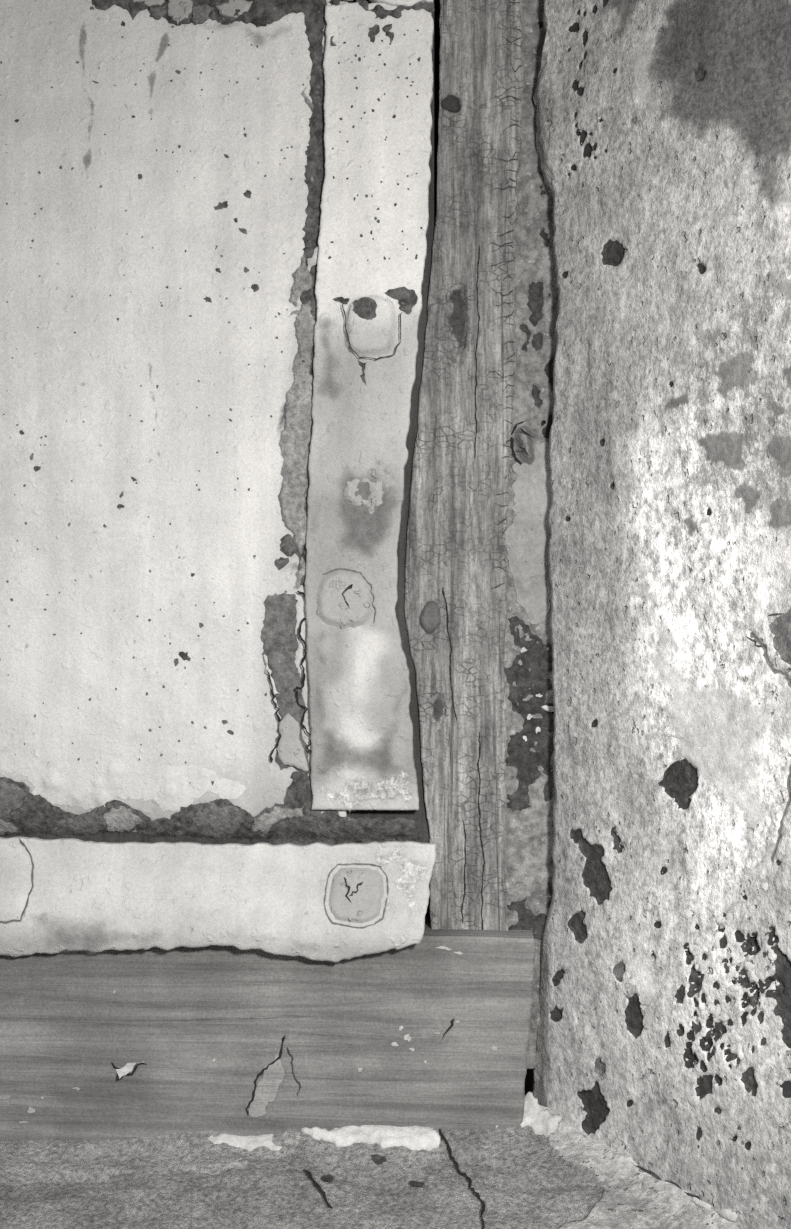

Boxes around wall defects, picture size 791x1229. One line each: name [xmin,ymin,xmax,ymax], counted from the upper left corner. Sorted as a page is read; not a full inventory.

damp [605,0,637,32]
damp [628,0,791,203]
peeling [214,201,247,234]
crack [746,613,791,687]
peeling [504,616,554,812]
crack [771,765,791,861]
damp [629,953,659,1006]
peeling [116,1062,142,1079]
spalling [577,1058,609,1134]
peeling [0,1092,604,1229]
crack [439,1129,485,1229]